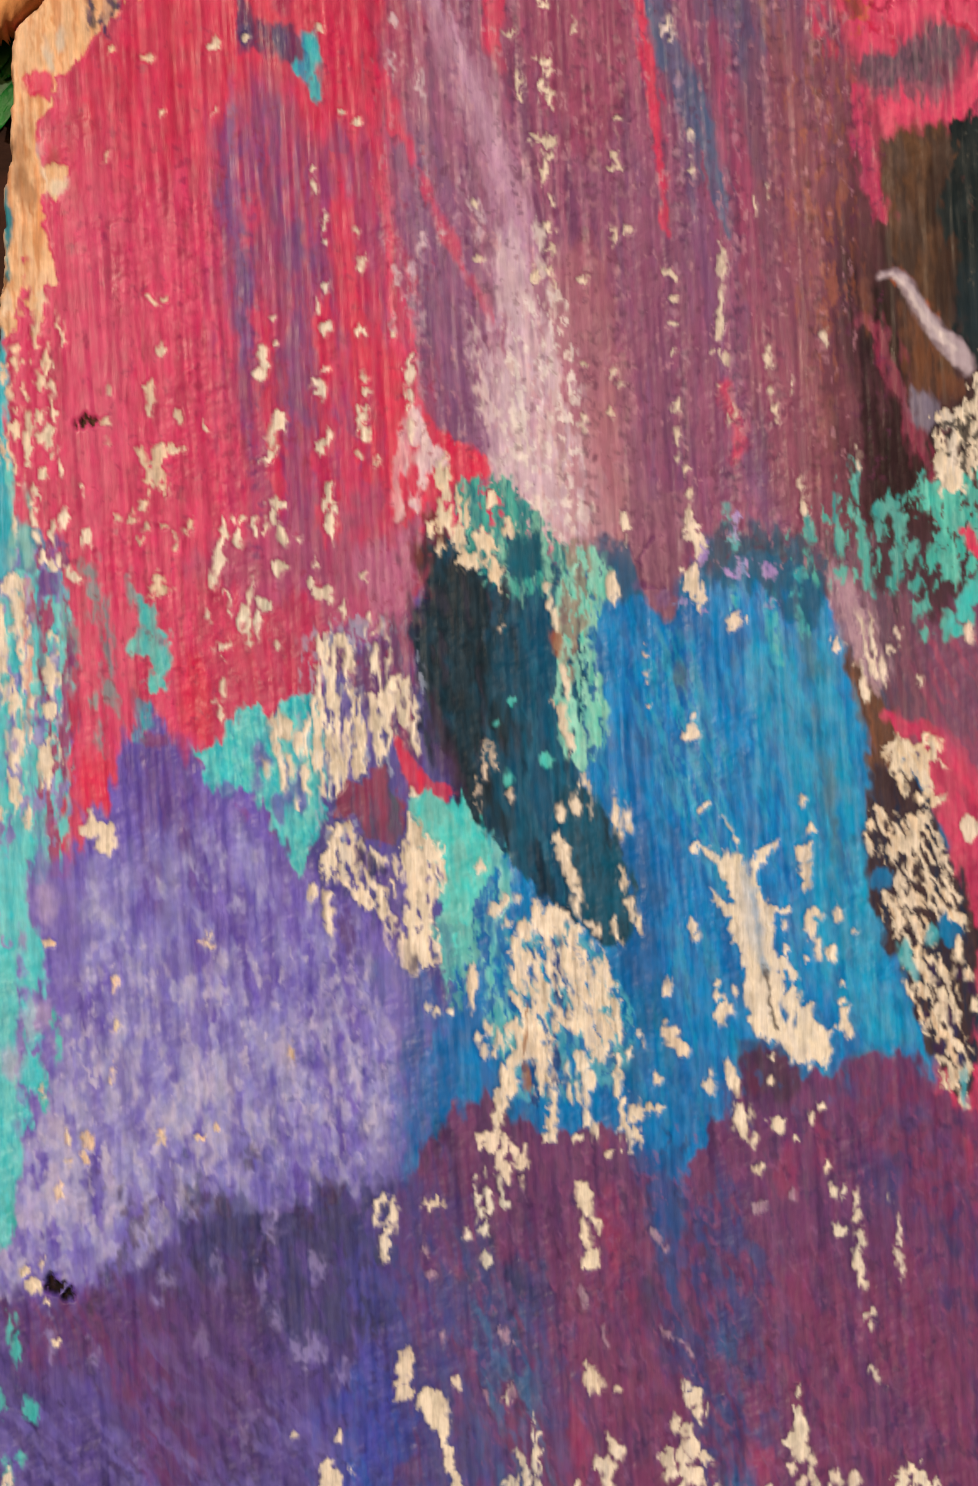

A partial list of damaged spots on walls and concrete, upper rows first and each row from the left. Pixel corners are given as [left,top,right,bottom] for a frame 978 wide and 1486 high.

peeling [0,0,123,584]
peeling [427,452,516,591]
peeling [932,373,978,498]
peeling [0,572,63,830]
peeling [263,562,423,813]
peeling [307,787,448,979]
peeling [425,772,669,1270]
peeling [690,796,856,1086]
peeling [863,734,978,1110]
peeling [393,1348,463,1486]
peeling [657,1379,721,1486]
peeling [782,1385,863,1486]